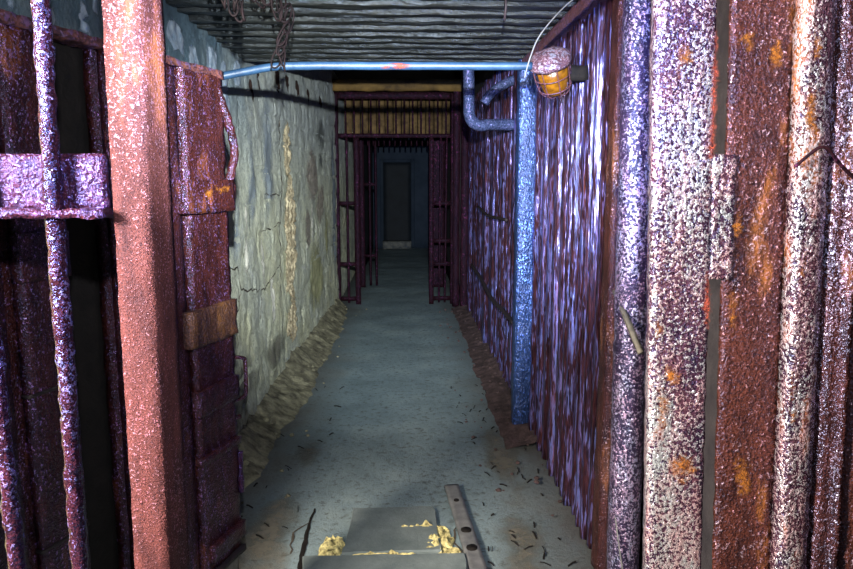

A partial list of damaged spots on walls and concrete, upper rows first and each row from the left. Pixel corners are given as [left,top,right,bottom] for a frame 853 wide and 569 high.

corrosion [771,41,783,64]
corrosion [805,94,816,131]
corrosion [737,465,749,493]
crack [289,508,316,569]